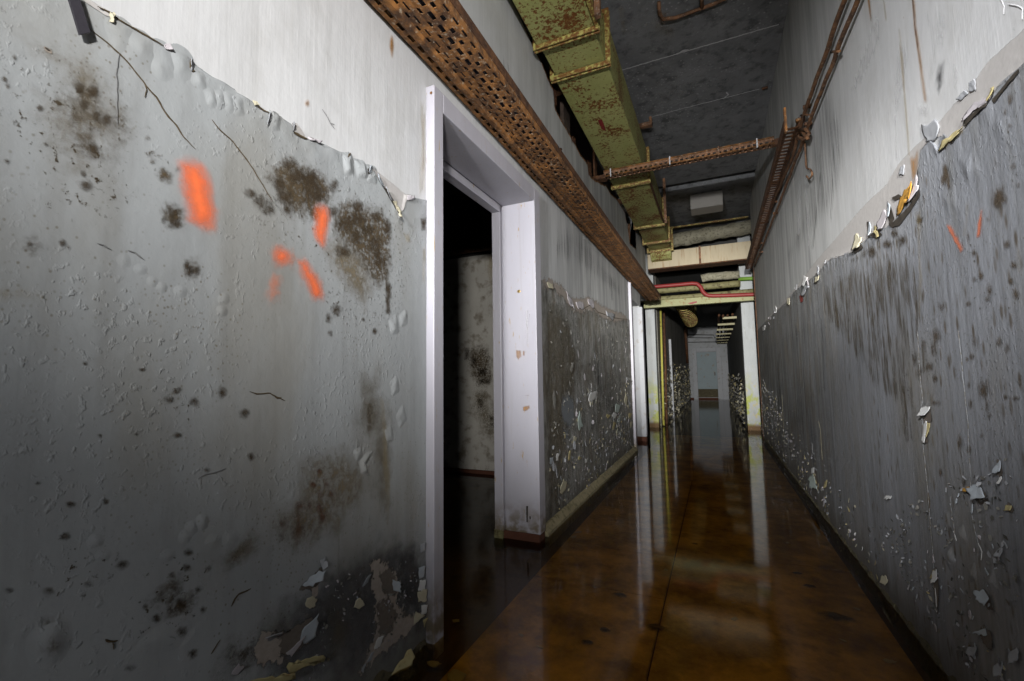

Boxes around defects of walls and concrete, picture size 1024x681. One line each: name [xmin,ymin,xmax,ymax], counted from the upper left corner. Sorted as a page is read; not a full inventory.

water stain [37,66,131,210]
crack [90,29,195,149]
water stain [249,157,404,333]
peeling [762,29,1024,331]
water stain [465,346,494,426]
peeling [542,278,633,511]
peeling [761,380,1019,681]
flaking render [232,557,428,681]